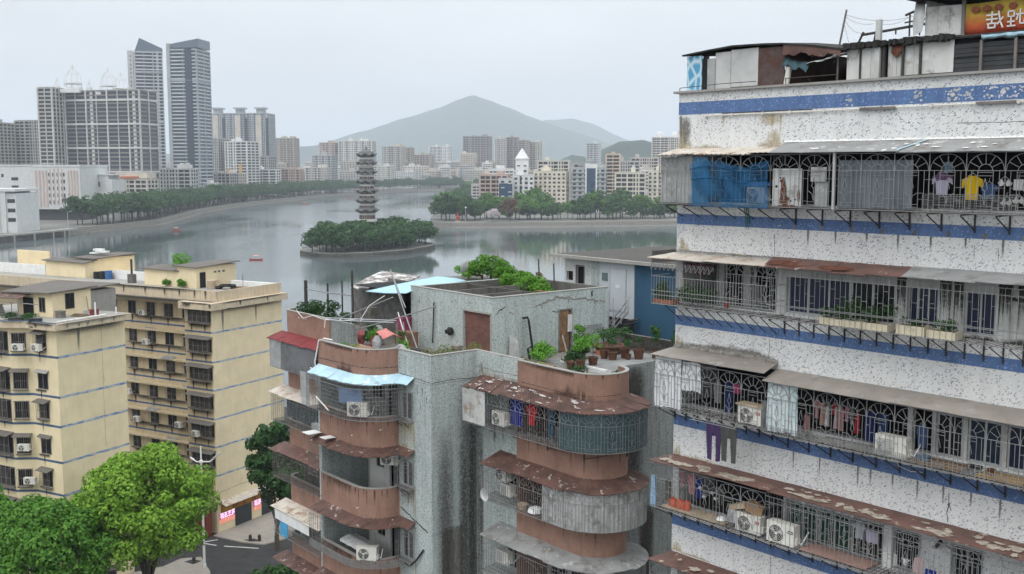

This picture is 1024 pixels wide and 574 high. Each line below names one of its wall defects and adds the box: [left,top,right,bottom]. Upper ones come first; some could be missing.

peeling [945,85,1024,101]
water stain [680,117,689,142]
rust [777,178,800,207]
rust [769,260,851,271]
crack [535,291,605,312]
peeling [660,457,755,482]
water stain [441,424,483,574]
peeling [784,487,892,520]
peeling [912,521,954,537]
peeling [973,535,1024,557]